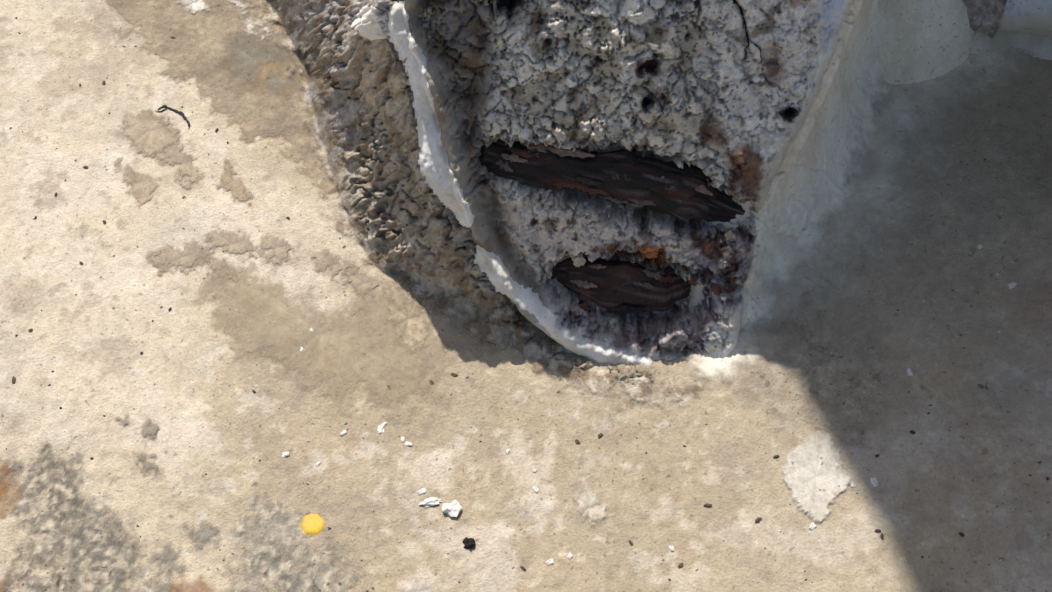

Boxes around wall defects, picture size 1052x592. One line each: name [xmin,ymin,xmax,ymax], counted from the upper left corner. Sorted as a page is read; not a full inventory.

crack [733,0,762,63]
spalling [105,0,708,404]
spalling [461,0,834,361]
corrosion [700,125,764,202]
corrosion [561,217,759,363]